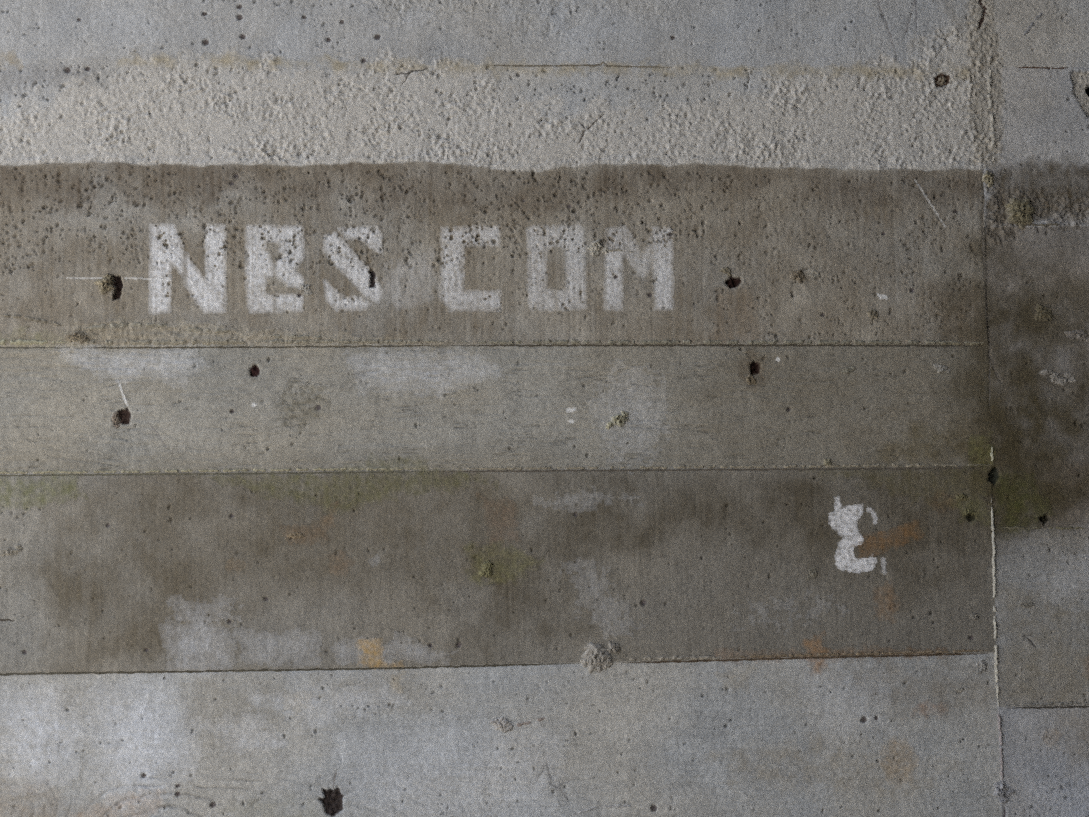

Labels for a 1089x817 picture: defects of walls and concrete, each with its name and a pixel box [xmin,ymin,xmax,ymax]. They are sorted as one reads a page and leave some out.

crack [979,0,989,28]
water stain [0,153,1089,220]
water stain [0,189,1089,817]
rust [856,518,925,558]